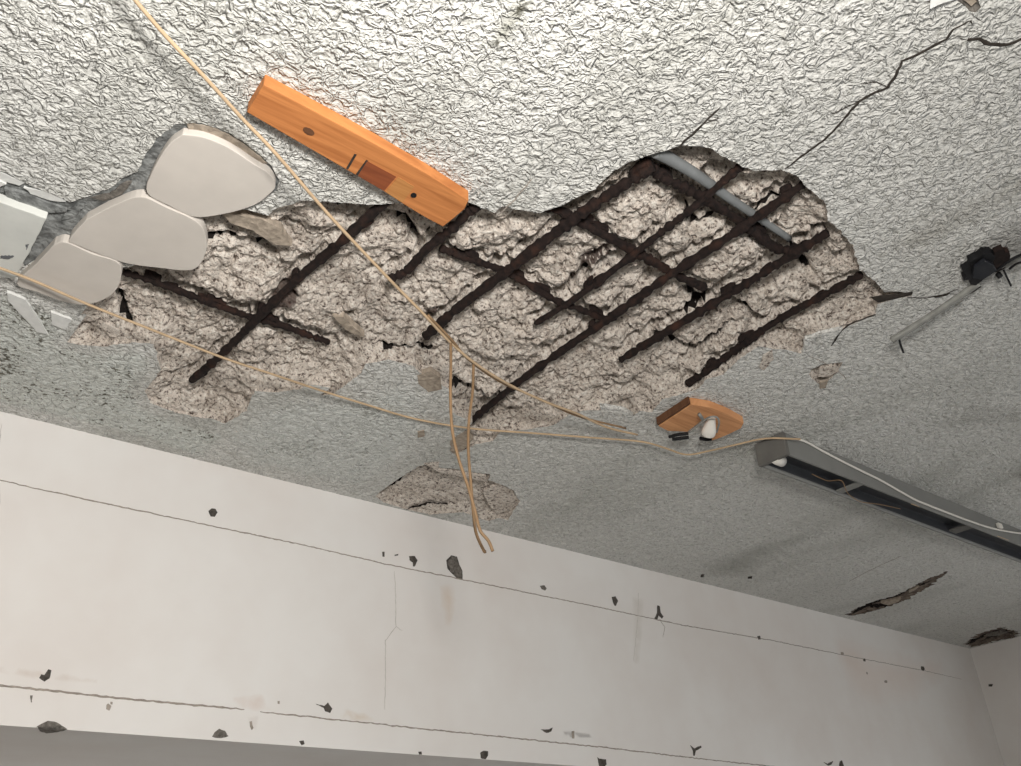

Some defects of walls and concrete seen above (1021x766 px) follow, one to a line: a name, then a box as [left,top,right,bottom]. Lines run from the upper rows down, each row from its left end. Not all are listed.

flaking render [0,123,279,266]
crack [678,107,720,148]
crack [785,20,1021,169]
spalling [0,145,913,521]
crack [0,480,959,695]
spalling [965,627,1020,647]